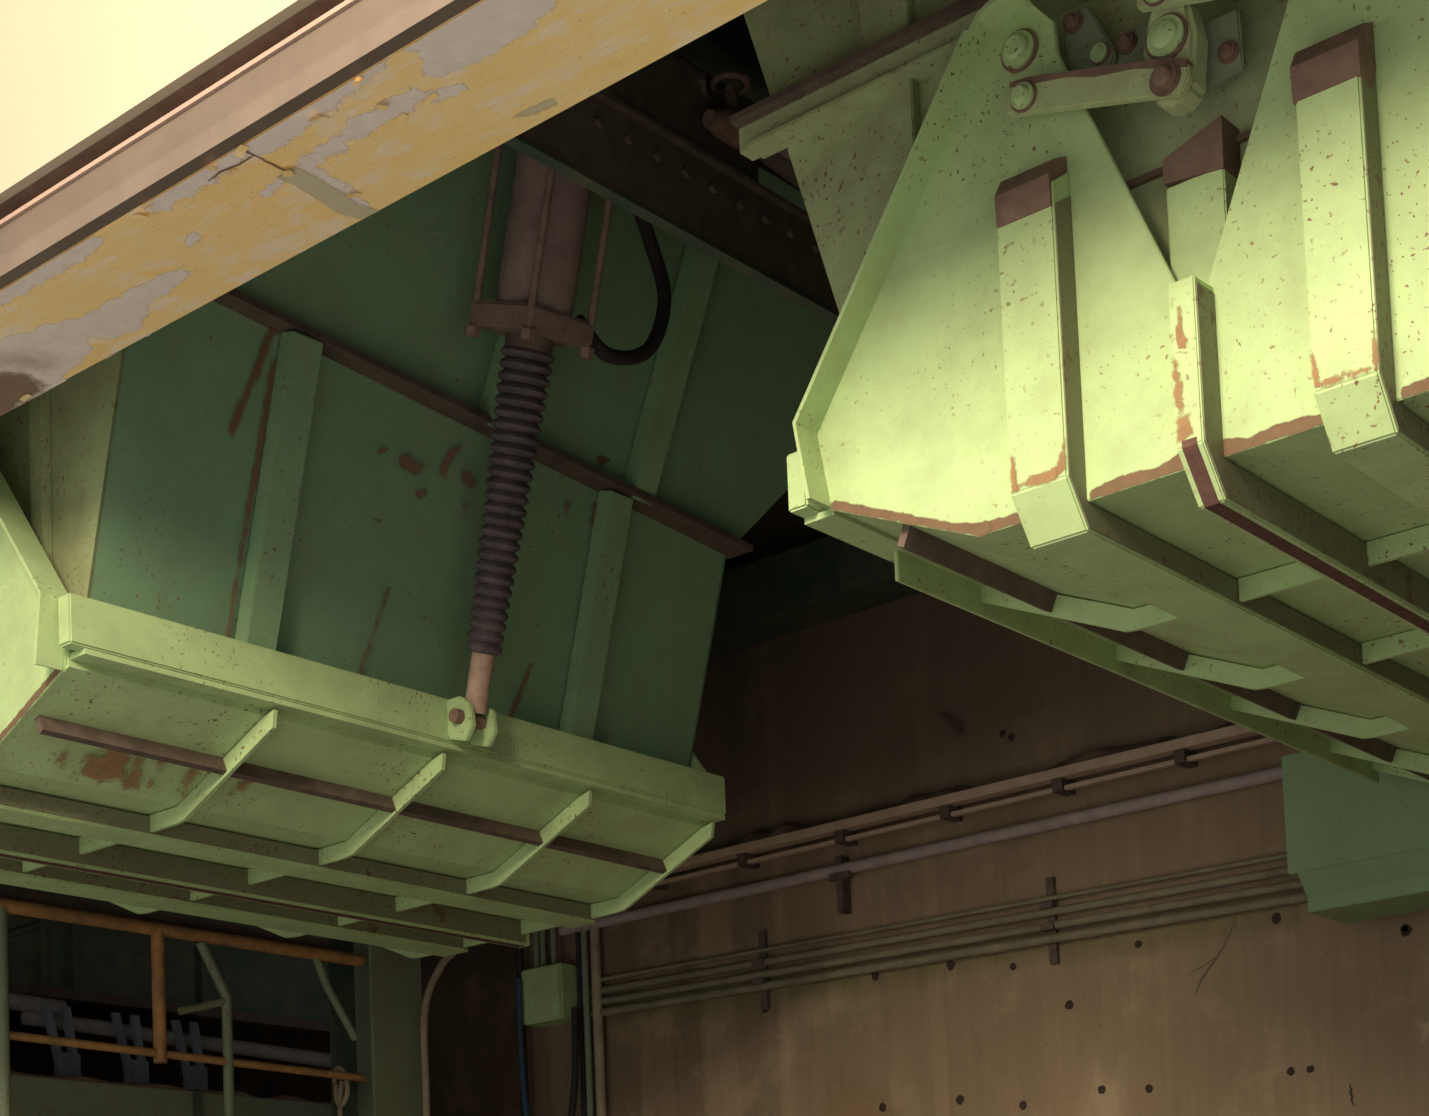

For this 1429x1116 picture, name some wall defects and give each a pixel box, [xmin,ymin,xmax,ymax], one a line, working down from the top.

rust [1009,57,1193,88]
peeling [0,236,105,307]
peeling [0,269,191,409]
water stain [0,373,43,416]
peeling [378,447,475,510]
rust [1010,444,1066,491]
rust [1090,308,1429,633]
rust [831,500,1022,536]
rust [56,749,165,791]